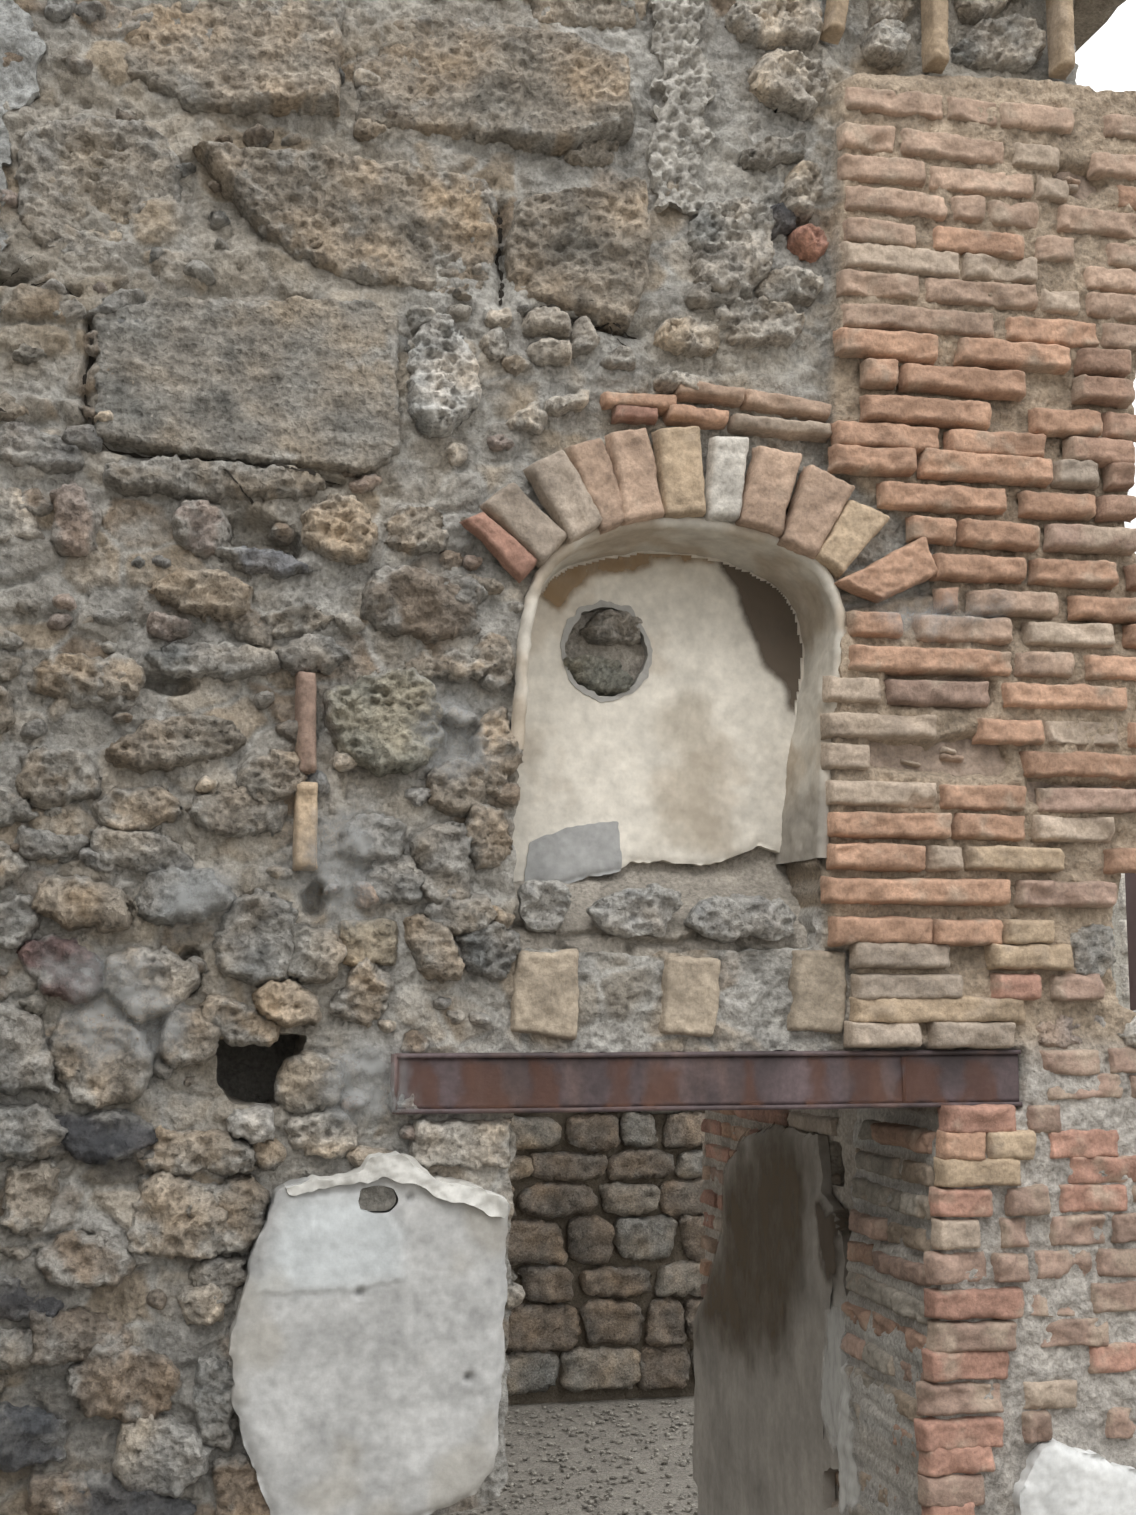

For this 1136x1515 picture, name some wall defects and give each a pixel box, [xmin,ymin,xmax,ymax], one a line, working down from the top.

crack [495,212,505,305]
crack [540,304,637,346]
damp [697,1136,849,1349]